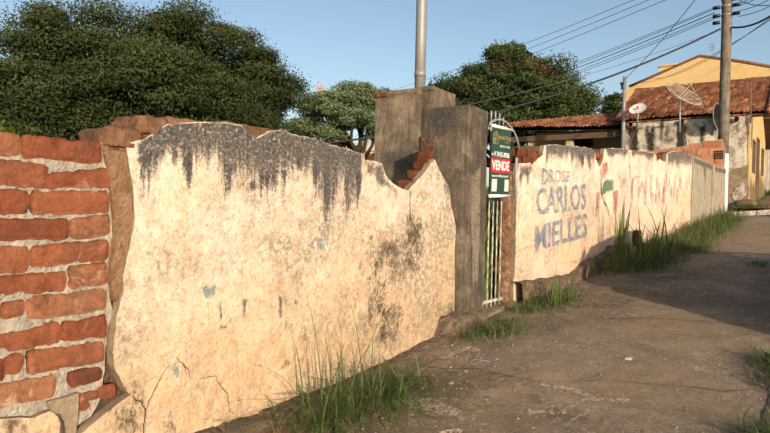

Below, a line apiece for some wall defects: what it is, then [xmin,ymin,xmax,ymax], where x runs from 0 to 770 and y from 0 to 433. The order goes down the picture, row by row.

water stain [137,123,413,224]
flaking render [397,135,455,189]
water stain [546,145,596,171]
water stain [607,123,726,178]
flaking render [0,132,133,433]
water stain [363,217,423,347]
crack [132,357,234,433]